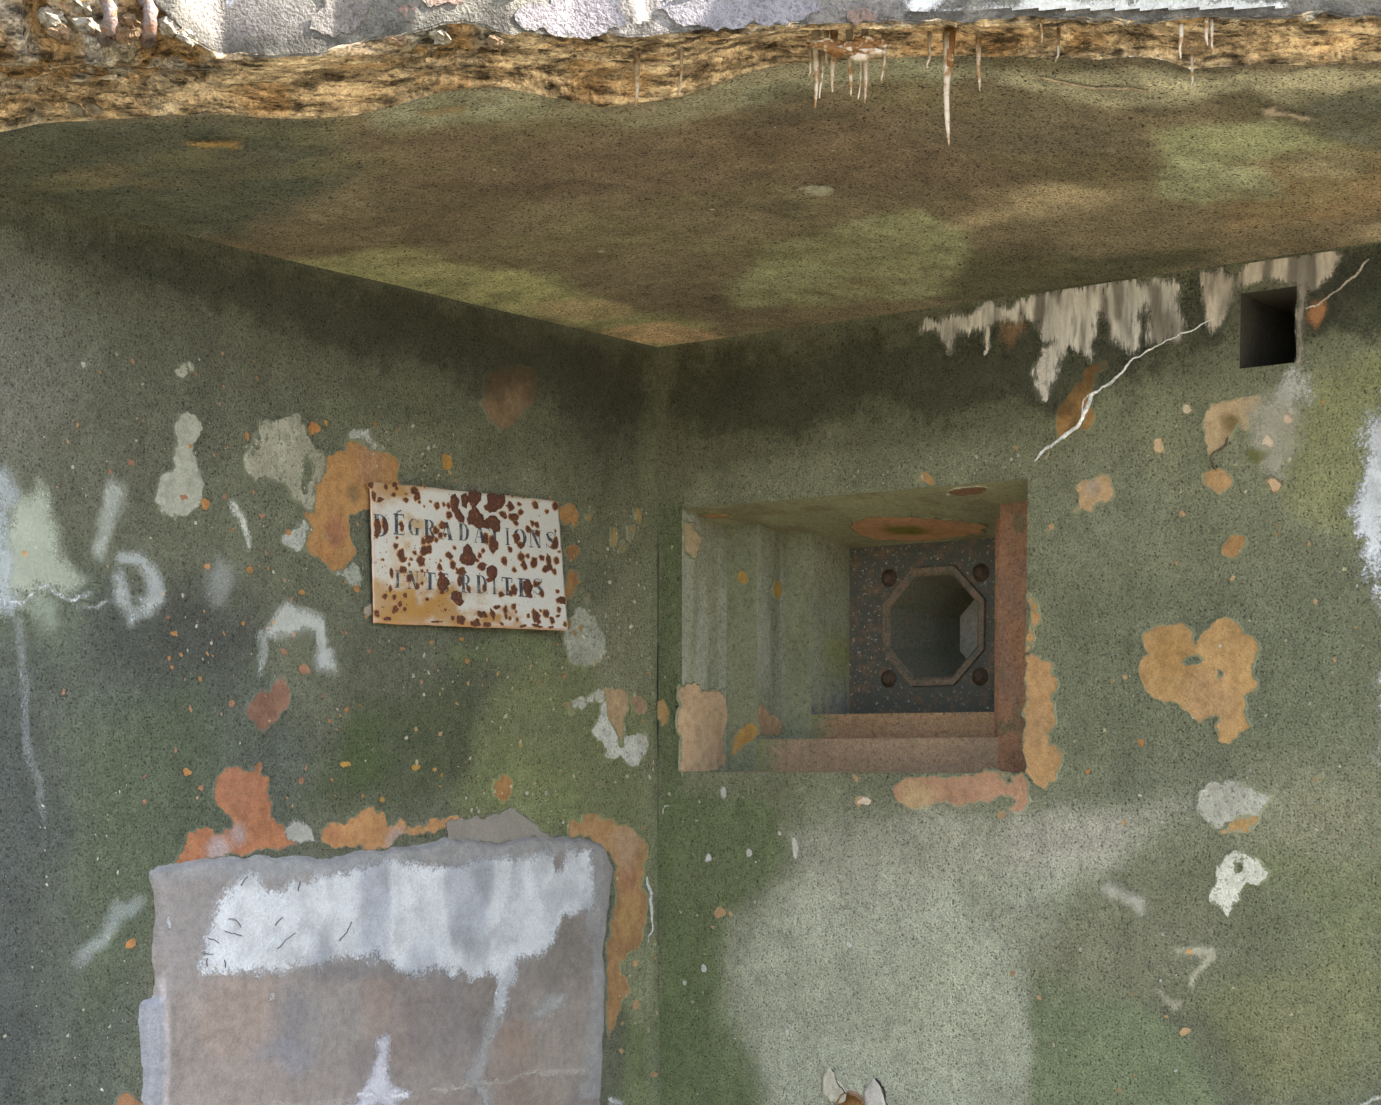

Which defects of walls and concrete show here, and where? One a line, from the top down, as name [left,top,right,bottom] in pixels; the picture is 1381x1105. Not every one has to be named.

spalling [0,0,1381,132]
leakage [993,0,1286,11]
leakage [923,278,1184,402]
crack [1034,319,1212,462]
crack [1209,437,1228,471]
leakage [1201,248,1381,409]
crack [1306,259,1369,309]
peeling [890,590,1066,819]
peeling [1110,616,1262,745]
leakage [198,848,596,1105]
peeling [172,762,649,1053]
flaking render [1196,778,1274,918]